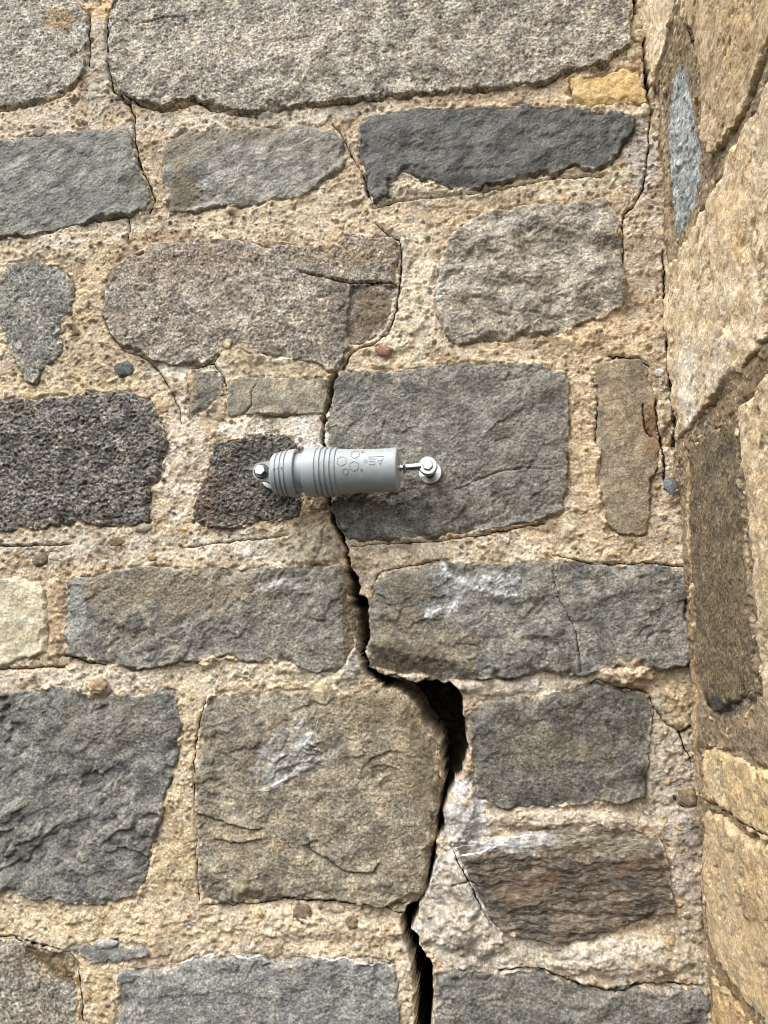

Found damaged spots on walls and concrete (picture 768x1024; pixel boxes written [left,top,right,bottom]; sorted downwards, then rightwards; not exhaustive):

crack [317,502,544,607]
crack [552,555,691,762]
crack [193,637,492,1024]